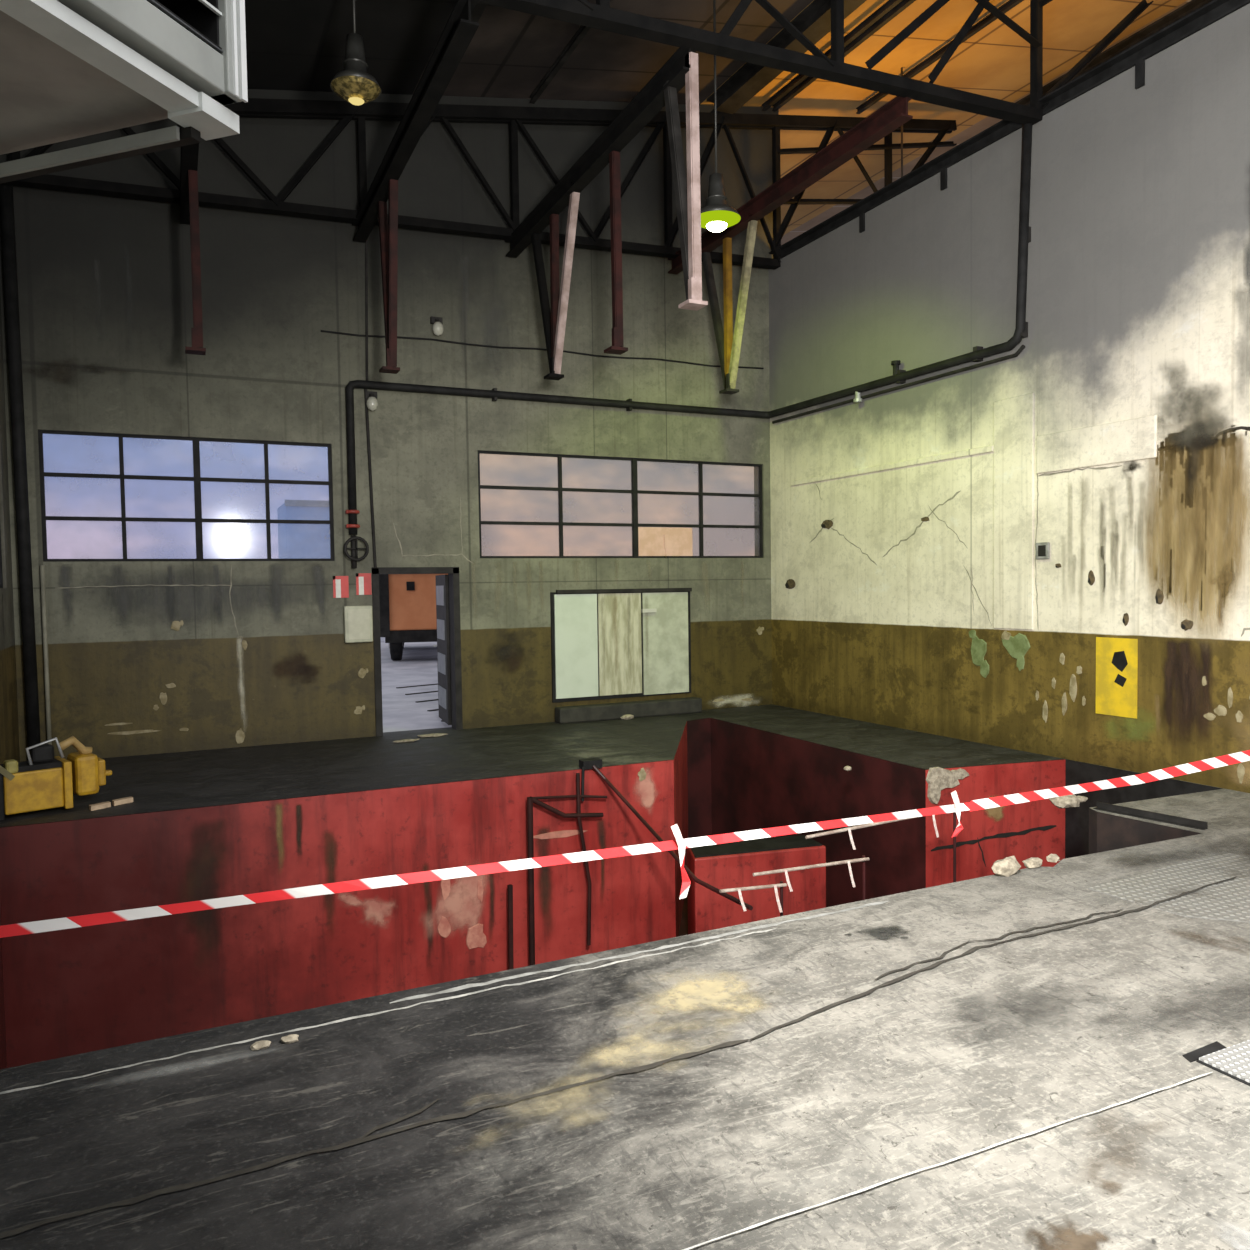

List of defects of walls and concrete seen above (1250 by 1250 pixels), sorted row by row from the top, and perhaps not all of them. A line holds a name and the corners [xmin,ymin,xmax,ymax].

crack [811,485,991,623]
peeling [969,630,989,678]
peeling [1001,630,1030,671]
peeling [985,806,1004,820]
spalling [0,695,969,1069]